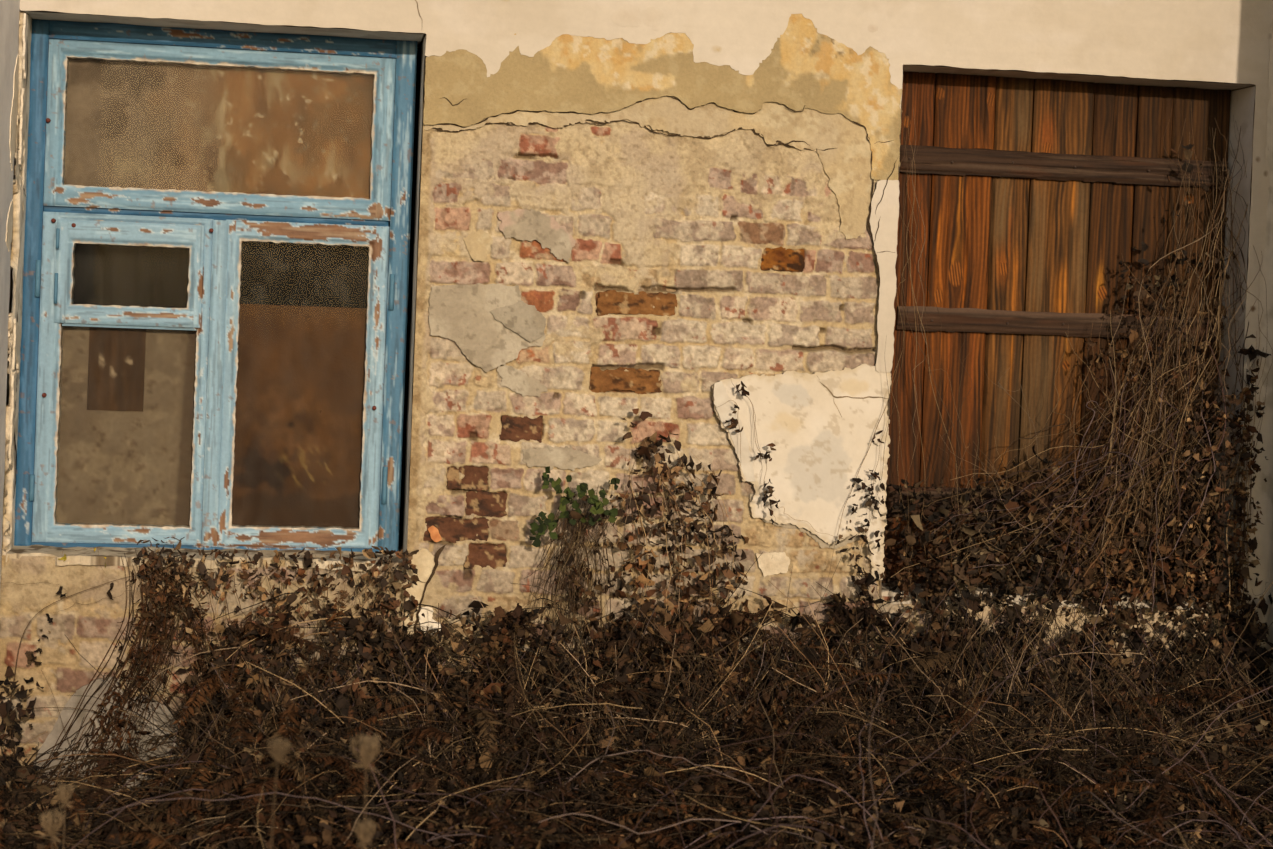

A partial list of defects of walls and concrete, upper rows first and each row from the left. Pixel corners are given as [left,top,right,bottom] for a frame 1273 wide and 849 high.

spalling [0,11,1018,766]
spalling [1021,599,1231,698]